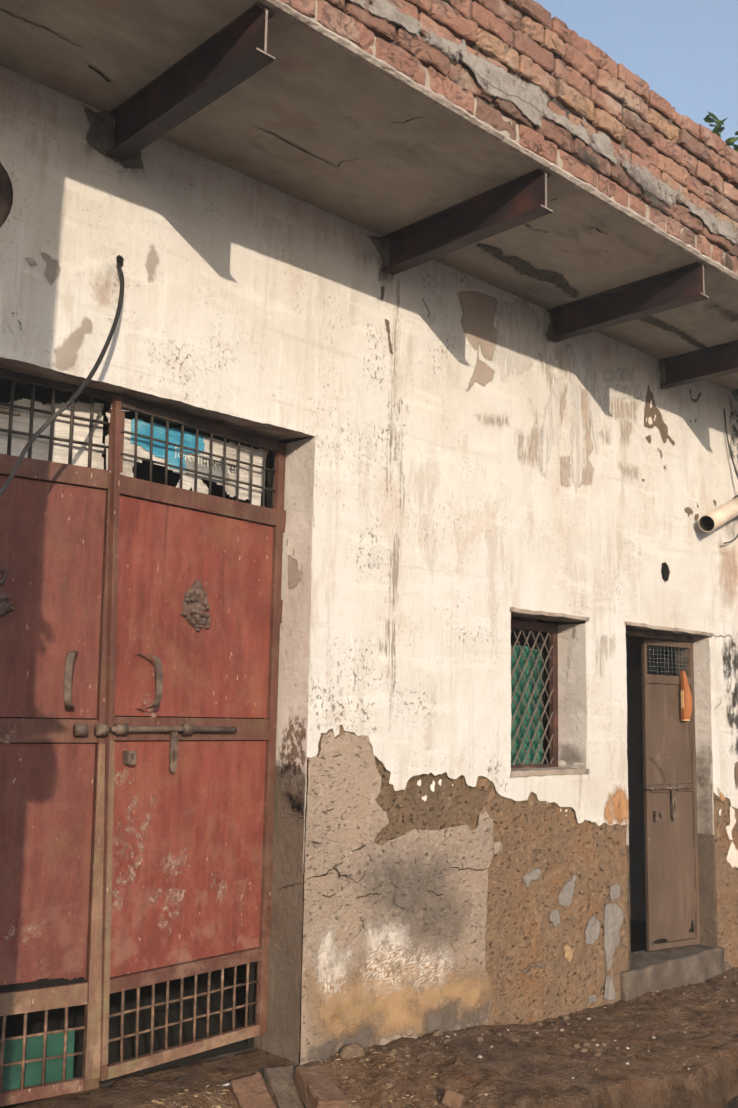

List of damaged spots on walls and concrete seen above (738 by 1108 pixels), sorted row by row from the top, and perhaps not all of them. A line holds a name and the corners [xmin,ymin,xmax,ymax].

crack [253,125,358,167]
peeling [55,318,92,371]
peeling [422,275,501,391]
peeling [541,349,567,422]
peeling [560,375,609,487]
peeling [608,384,675,469]
water stain [390,542,399,603]
water stain [380,621,395,669]
water stain [723,639,738,751]
flaking render [261,686,629,1065]
flaking render [711,792,738,984]